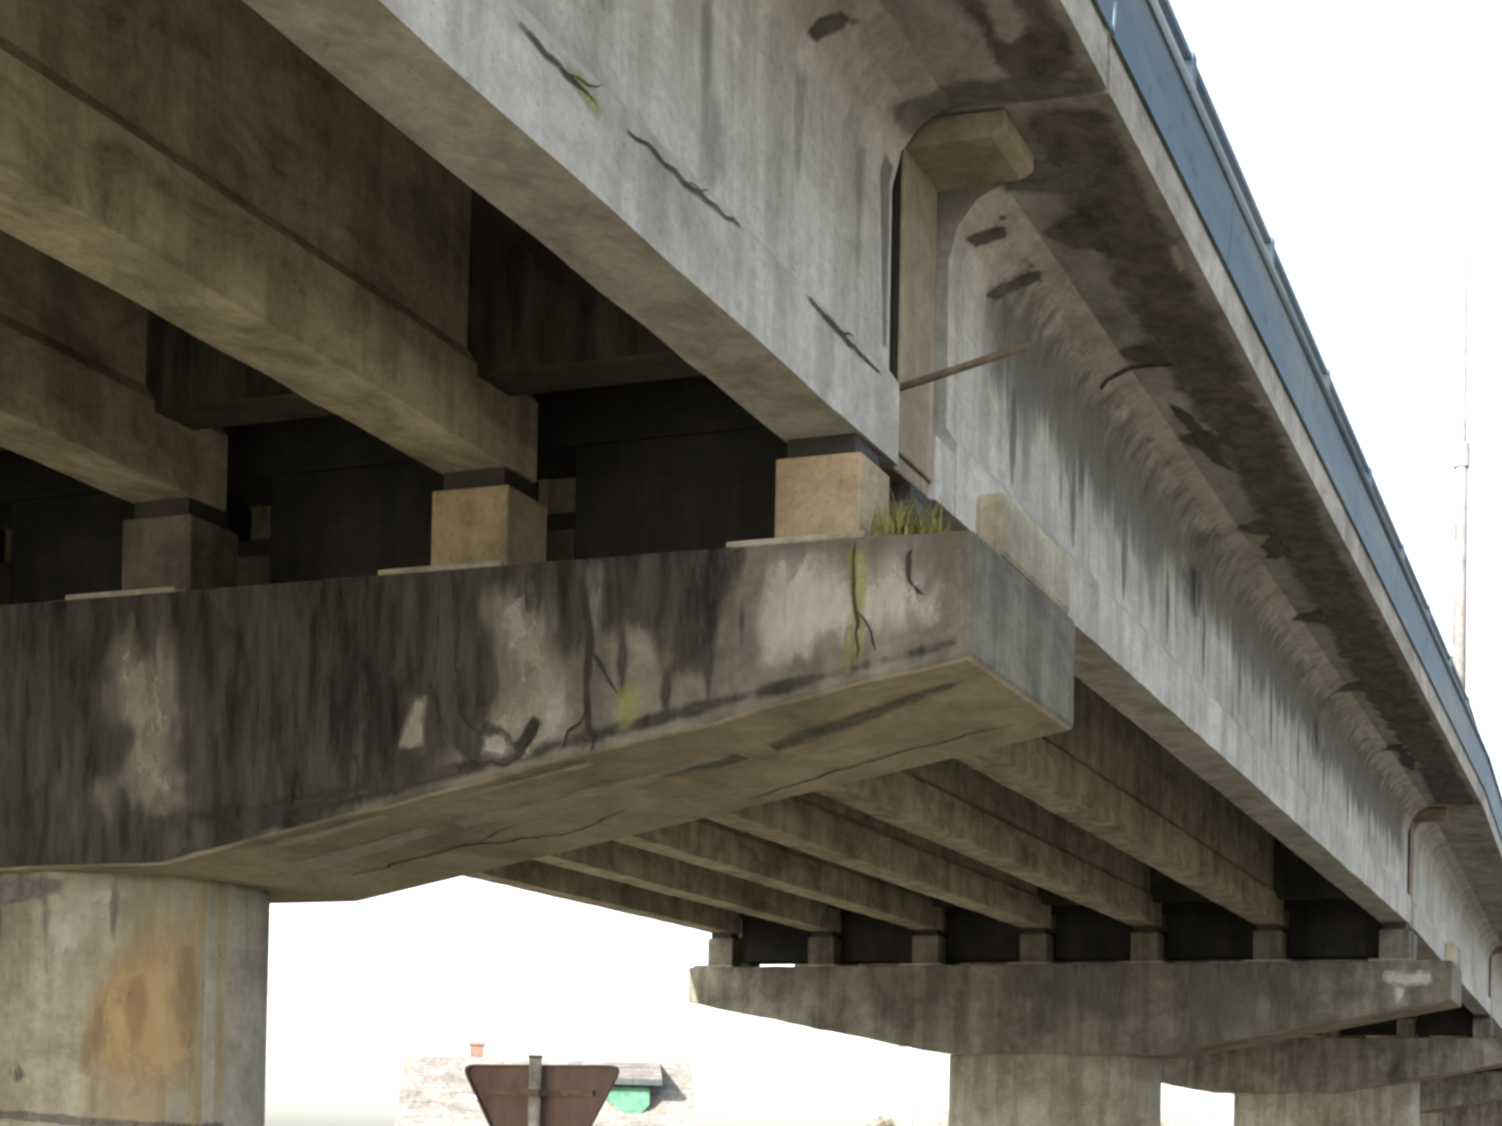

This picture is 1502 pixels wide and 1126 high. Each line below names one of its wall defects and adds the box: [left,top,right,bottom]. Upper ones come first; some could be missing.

spalling [809,12,856,41]
leakage [881,155,893,345]
leakage [895,0,1474,857]
leakage [0,547,823,950]
crack [561,579,616,751]
leakage [763,561,932,671]
leakage [768,684,956,751]
crack [354,809,626,875]
rust [100,899,228,1126]
leakage [0,1111,224,1126]